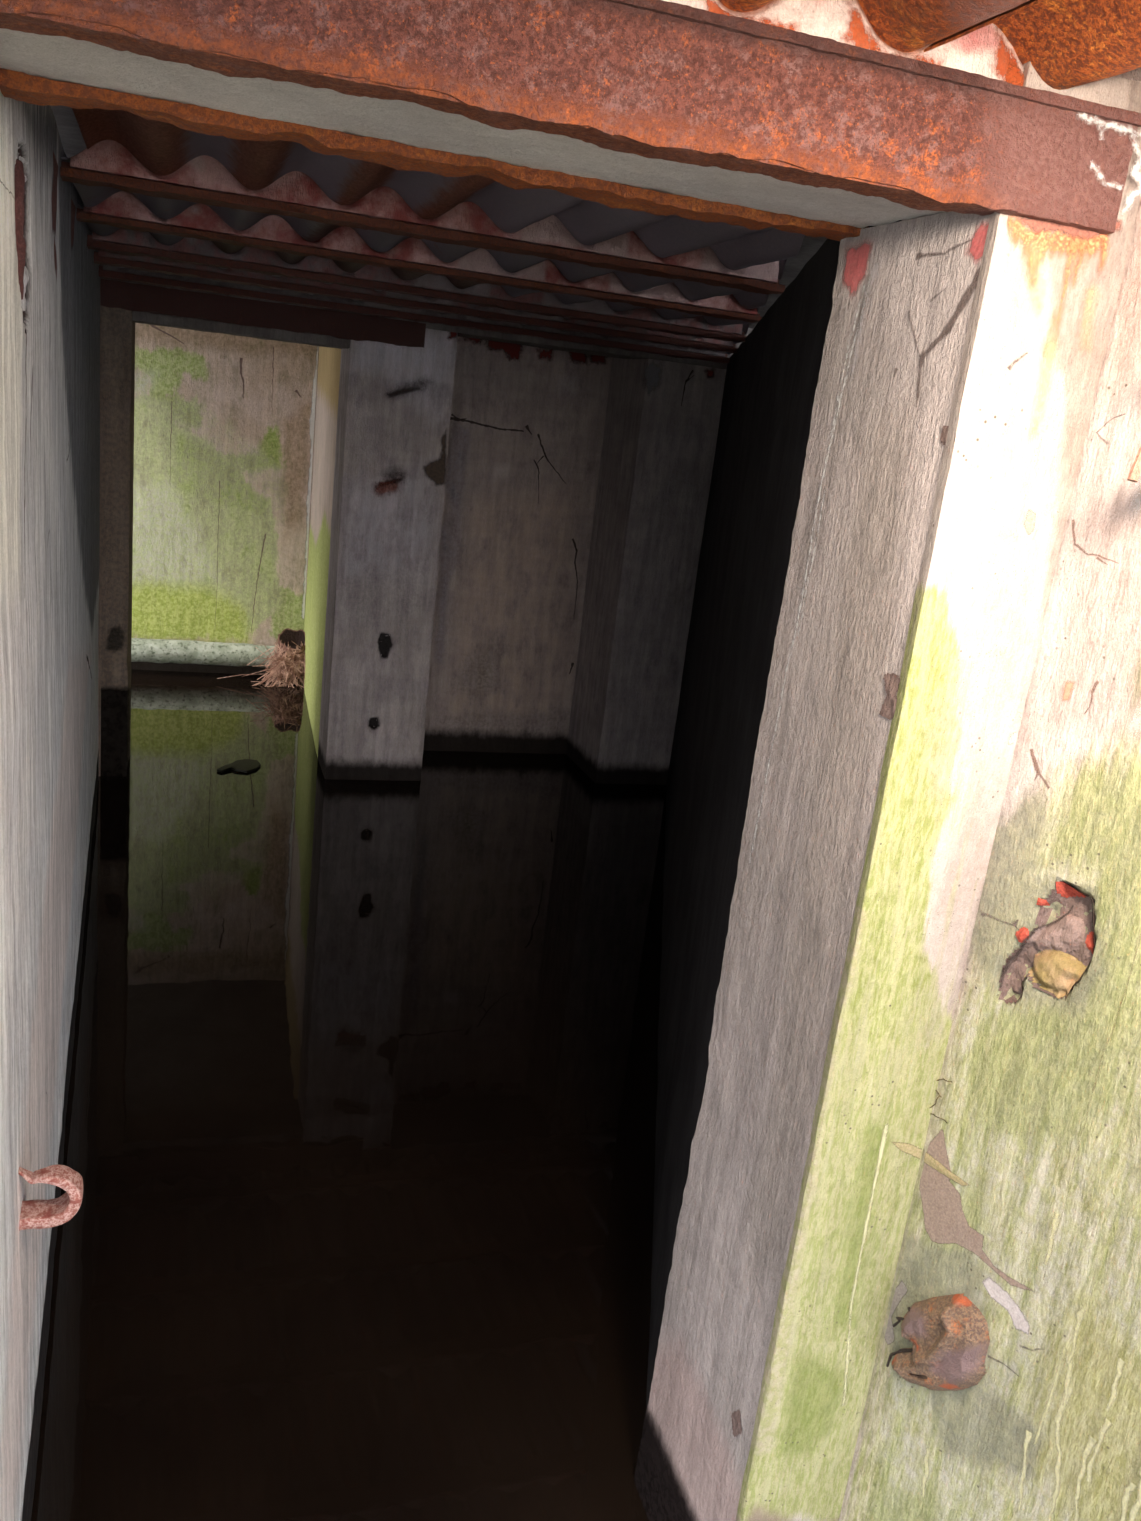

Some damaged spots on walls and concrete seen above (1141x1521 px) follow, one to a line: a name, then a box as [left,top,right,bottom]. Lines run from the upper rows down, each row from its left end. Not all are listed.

corrosion [706,0,795,31]
corrosion [845,9,941,66]
corrosion [996,37,1024,86]
water stain [1081,114,1141,209]
crack [894,245,981,407]
corrosion [1008,216,1121,425]
crack [450,413,566,504]
spalling [999,881,1096,1004]
water stain [843,1125,888,1404]
peeling [893,1130,1032,1334]
water stain [634,1410,695,1521]
water stain [1018,1308,1125,1521]